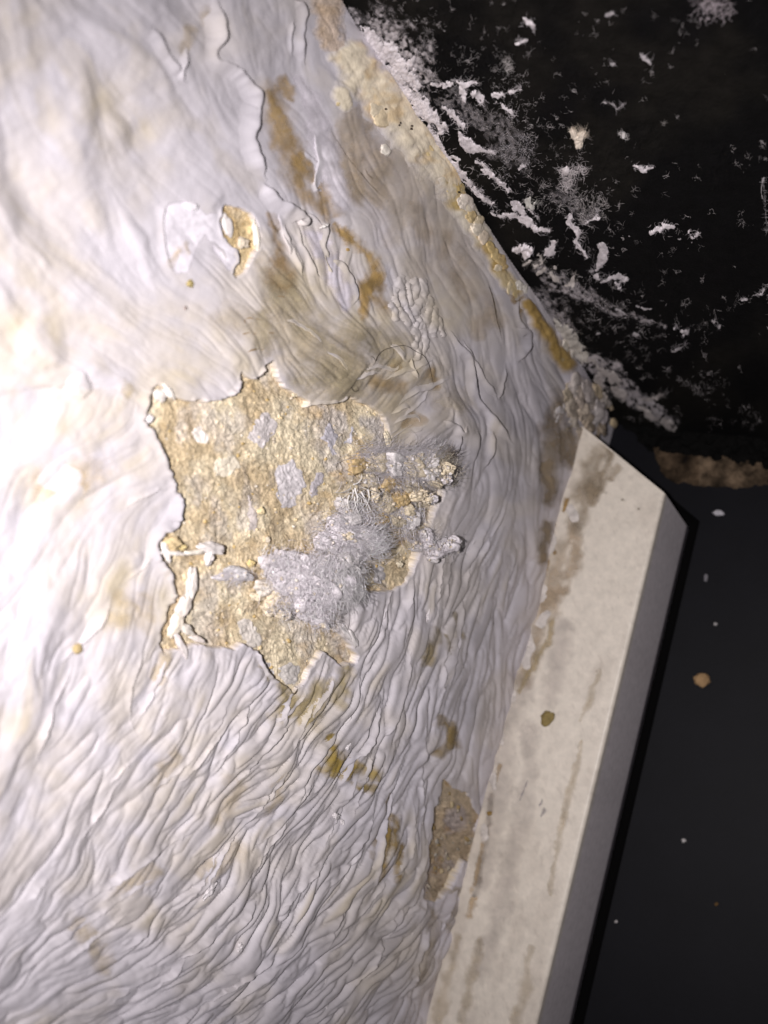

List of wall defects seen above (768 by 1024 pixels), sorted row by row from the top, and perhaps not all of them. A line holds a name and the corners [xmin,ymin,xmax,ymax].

peeling [154,198,261,288]
peeling [202,0,360,306]
water stain [268,78,328,199]
water stain [309,0,677,432]
spalling [133,363,438,690]
water stain [211,428,475,637]
water stain [424,644,435,665]
water stain [540,401,577,504]
water stain [511,451,613,702]
spalling [424,779,492,902]